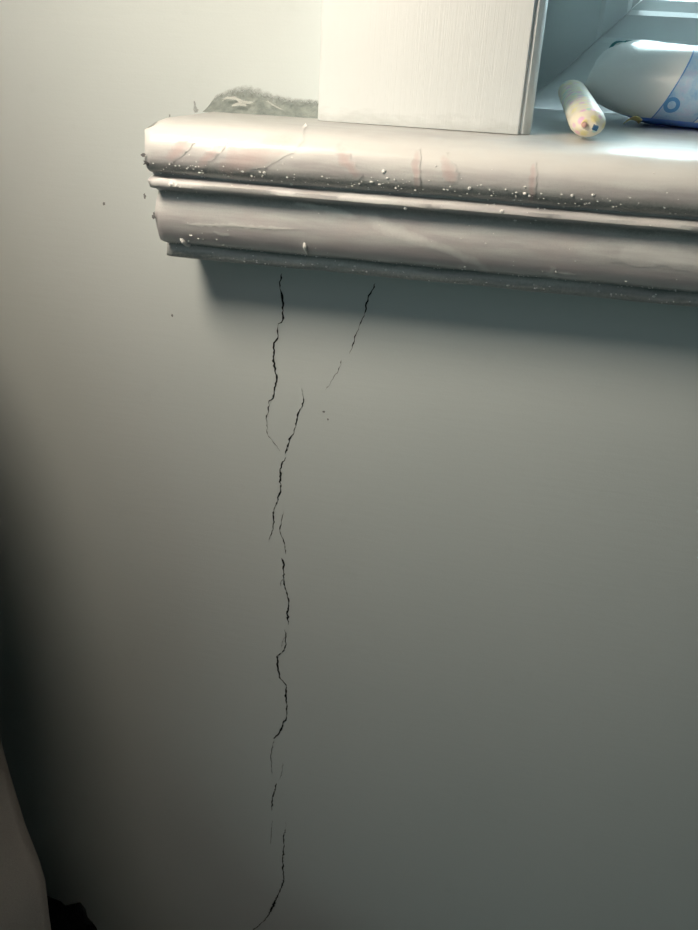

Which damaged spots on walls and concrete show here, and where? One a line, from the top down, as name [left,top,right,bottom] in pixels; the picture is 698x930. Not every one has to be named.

crack [253,274,304,930]
crack [331,284,375,381]